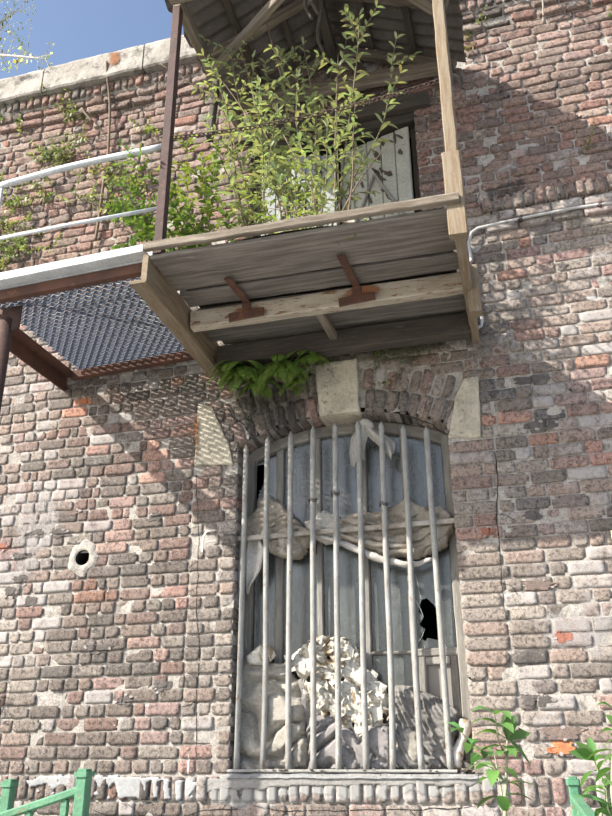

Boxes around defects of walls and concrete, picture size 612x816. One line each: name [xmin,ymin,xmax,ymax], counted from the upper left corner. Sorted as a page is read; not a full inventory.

crack [494,452,518,614]
flaking render [16,764,76,795]
flaking render [94,775,197,804]